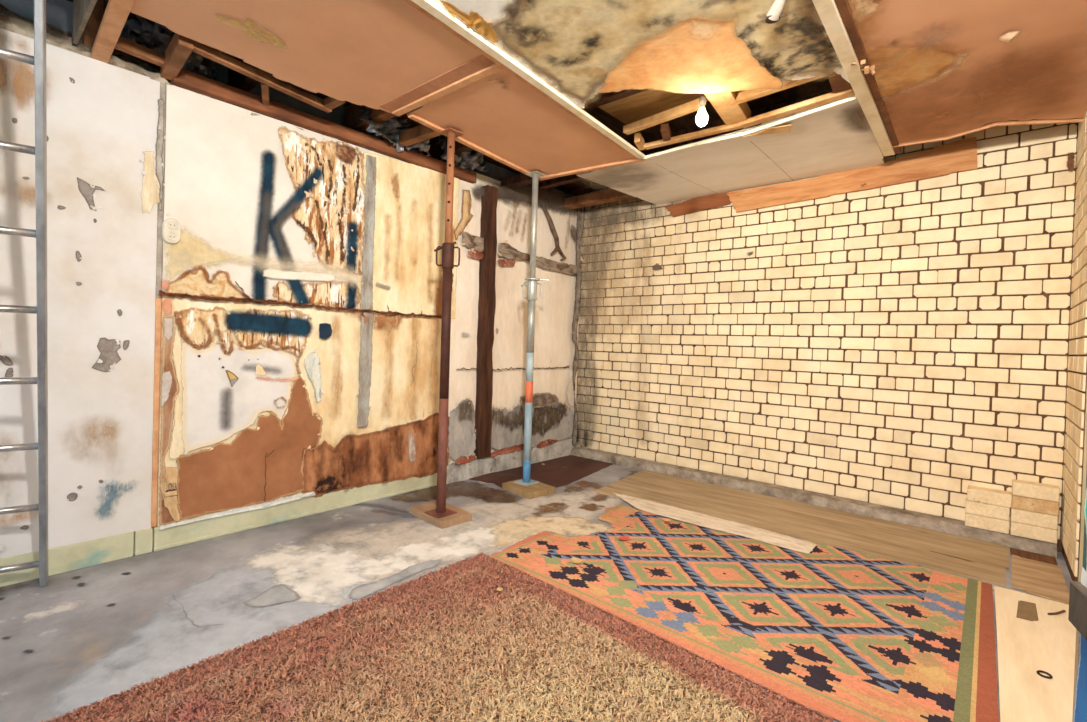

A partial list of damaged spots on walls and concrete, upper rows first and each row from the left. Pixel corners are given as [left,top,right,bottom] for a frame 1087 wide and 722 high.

water stain [491,0,840,103]
peeling [597,16,783,94]
water stain [847,107,867,130]
water stain [850,0,880,41]
water stain [867,30,1064,138]
peeling [77,177,105,223]
peeling [246,126,484,321]
flaking render [498,240,577,275]
peeling [92,338,130,372]
water stain [473,184,682,447]
peeling [159,306,324,530]
water stain [302,401,517,517]